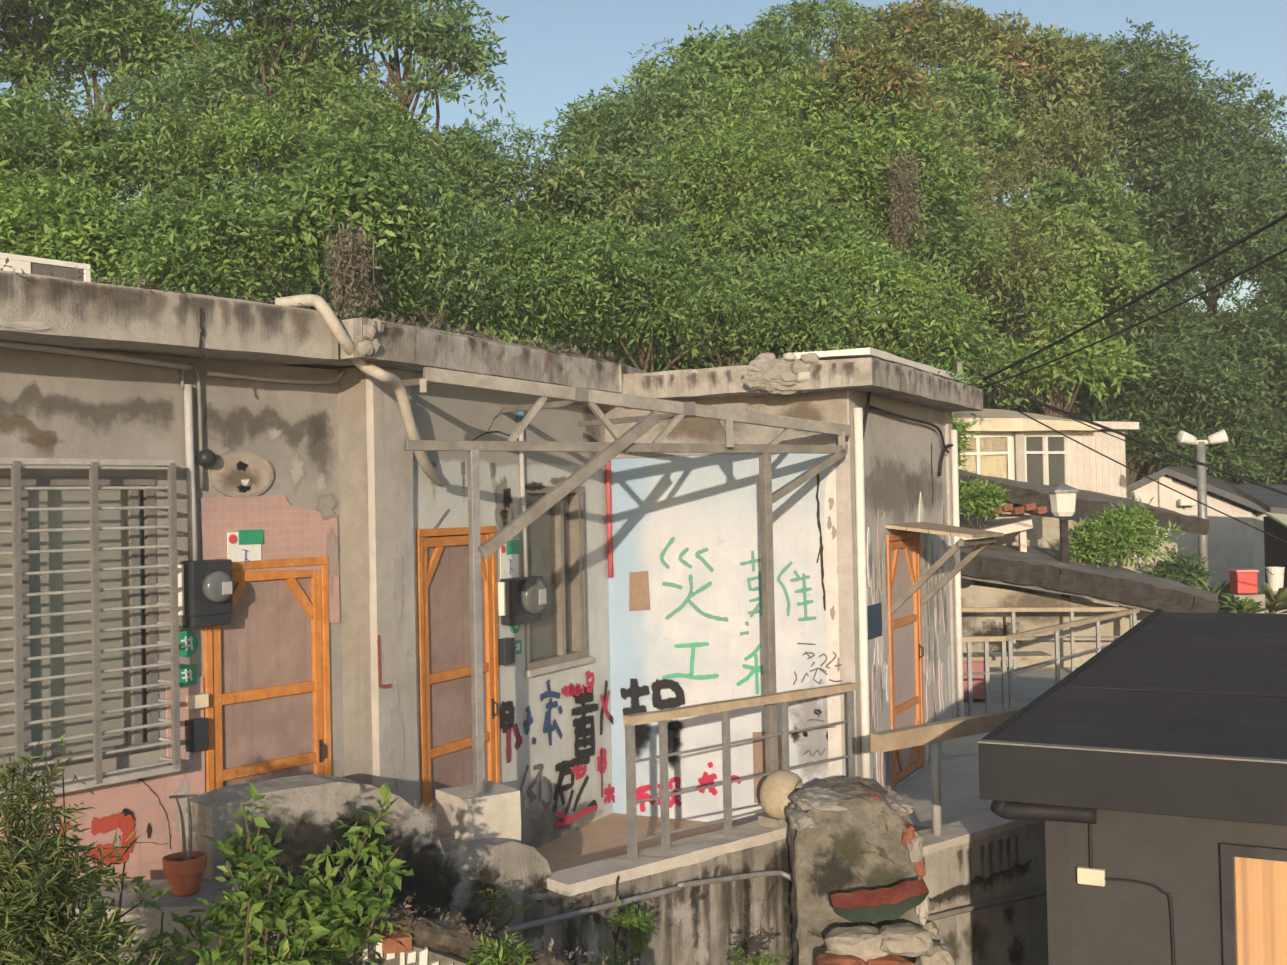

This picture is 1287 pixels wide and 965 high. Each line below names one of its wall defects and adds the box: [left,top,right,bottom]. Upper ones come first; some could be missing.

water stain [0,273,162,314]
crack [198,307,206,358]
water stain [175,295,309,333]
spalling [741,352,819,395]
water stain [0,386,171,451]
water stain [206,409,326,465]
flaking render [289,452,338,590]
crack [816,473,826,611]